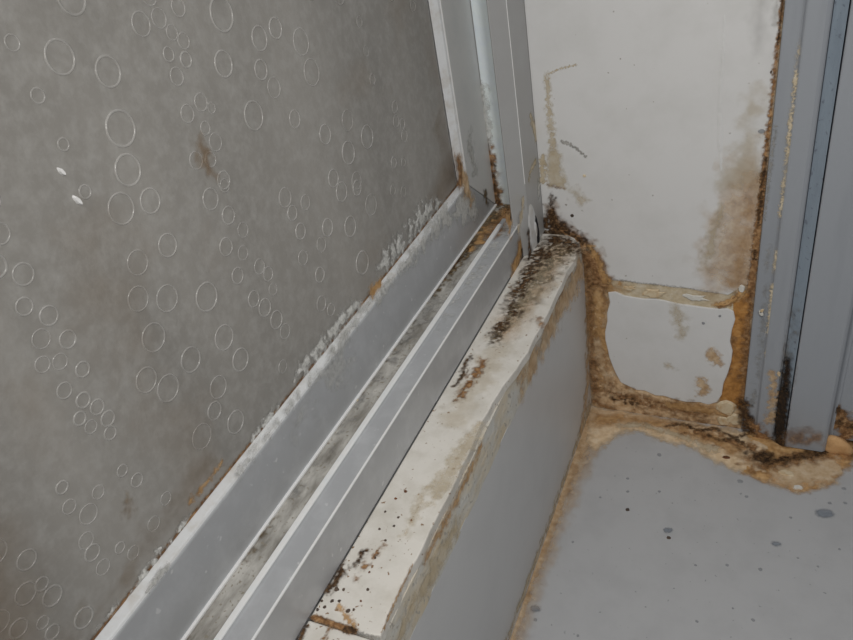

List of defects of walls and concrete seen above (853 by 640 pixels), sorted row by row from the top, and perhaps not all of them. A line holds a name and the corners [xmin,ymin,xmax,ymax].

water stain [539,64,587,189]
water stain [398,443,482,640]
water stain [509,258,768,640]